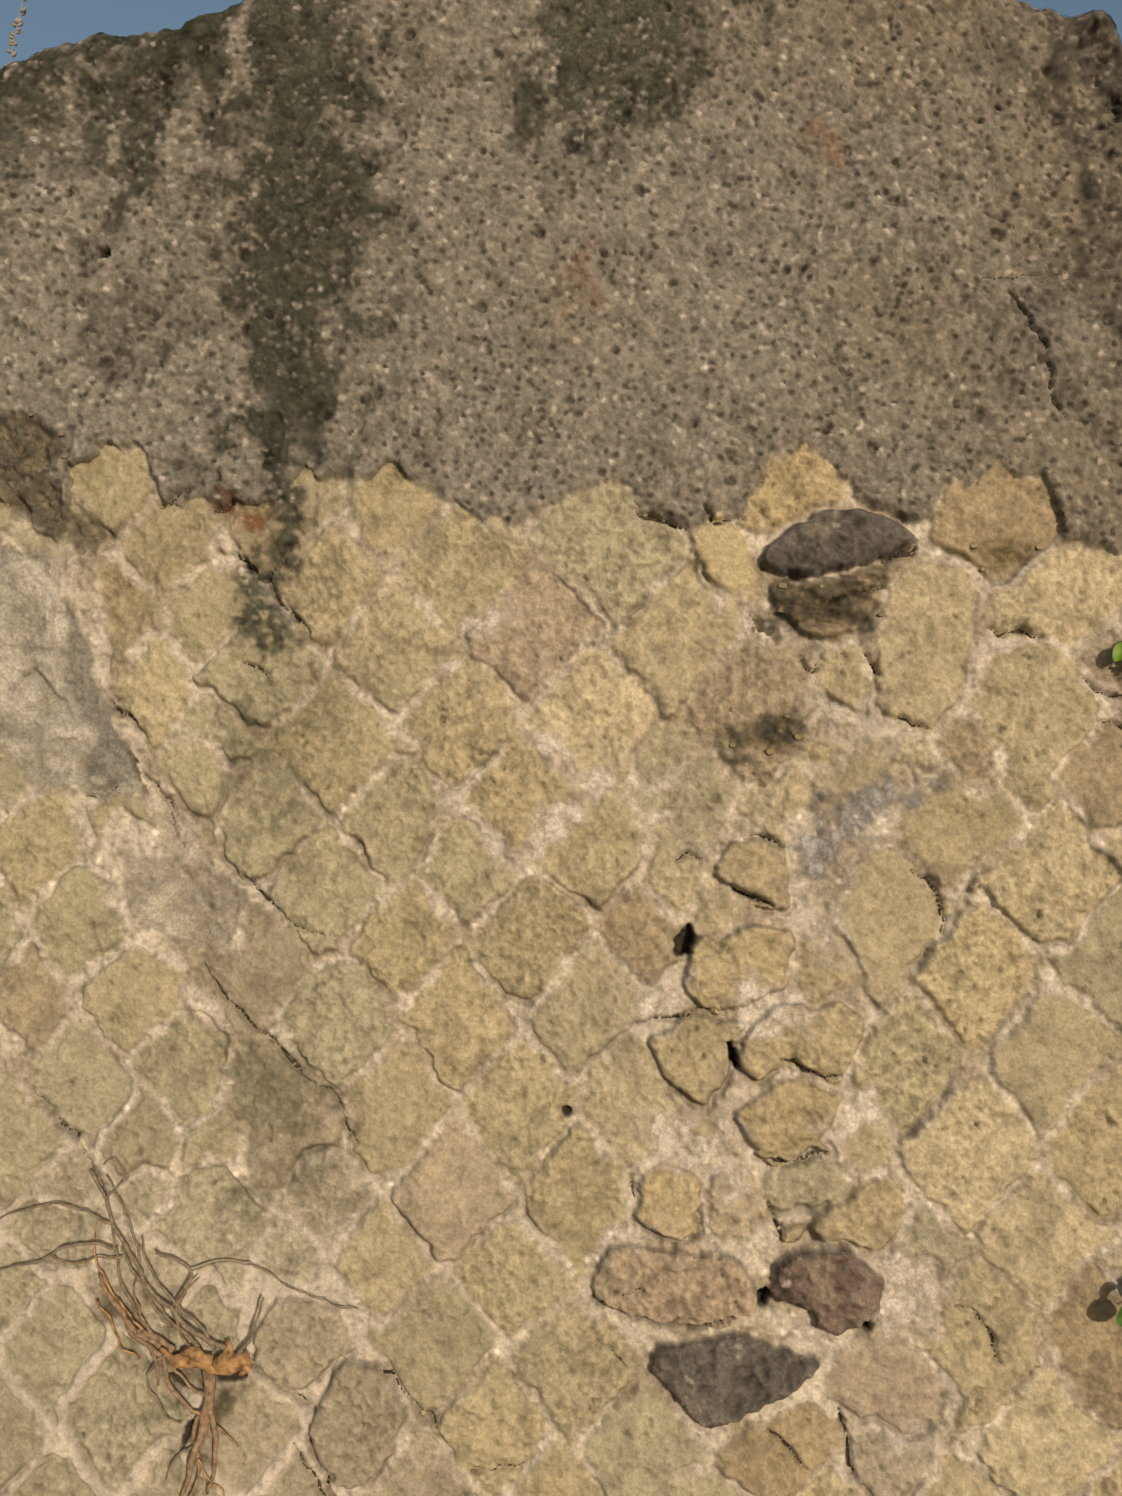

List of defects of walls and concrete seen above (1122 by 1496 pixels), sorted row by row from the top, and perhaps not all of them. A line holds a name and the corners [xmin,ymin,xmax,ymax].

crack [978,267,1114,418]
crack [204,963,357,1141]
crack [293,1442,336,1496]
crack [380,1370,442,1436]